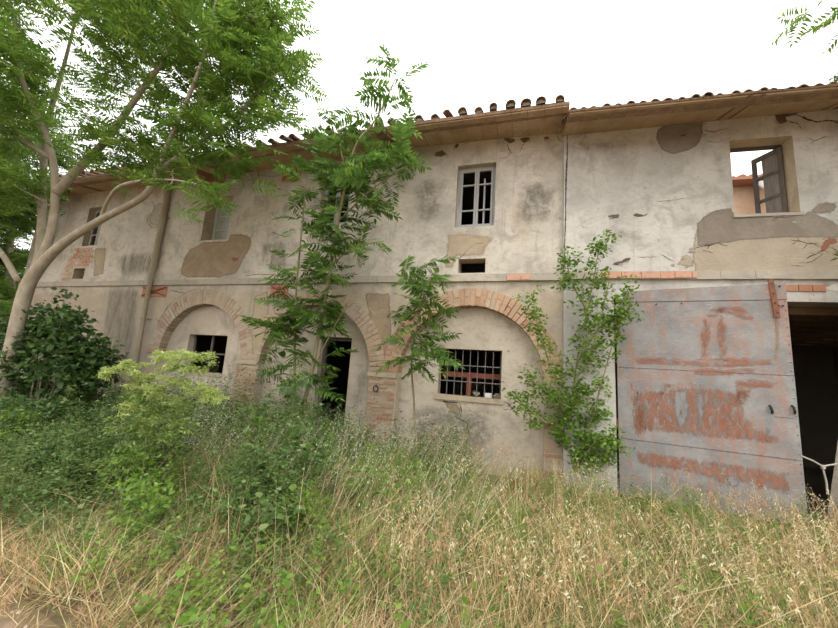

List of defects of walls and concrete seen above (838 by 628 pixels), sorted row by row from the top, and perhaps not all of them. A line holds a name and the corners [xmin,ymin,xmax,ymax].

crack [789,115,838,143]
flaking render [61,247,106,280]
flaking render [181,234,252,279]
flaking render [441,231,492,267]
flaking render [600,230,838,278]
crack [792,239,837,266]